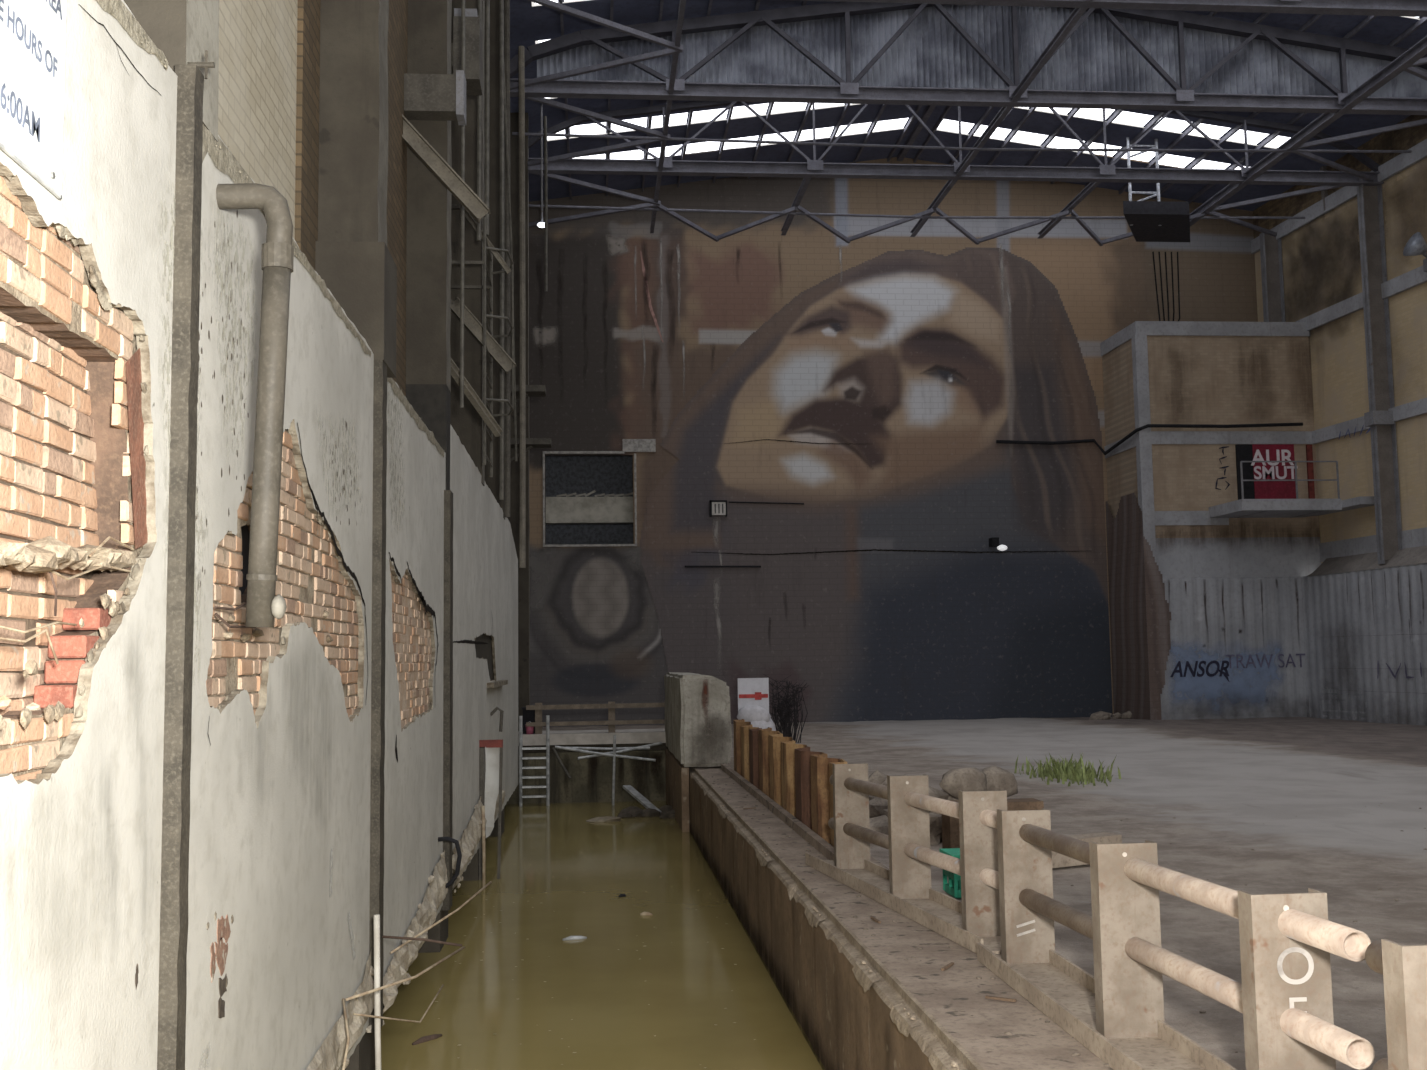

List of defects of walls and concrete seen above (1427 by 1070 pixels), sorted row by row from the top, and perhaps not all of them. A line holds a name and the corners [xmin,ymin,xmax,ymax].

spalling [202,124,254,184]
peeling [164,203,176,446]
spalling [0,176,149,780]
spalling [193,210,371,717]
spalling [390,567,433,729]